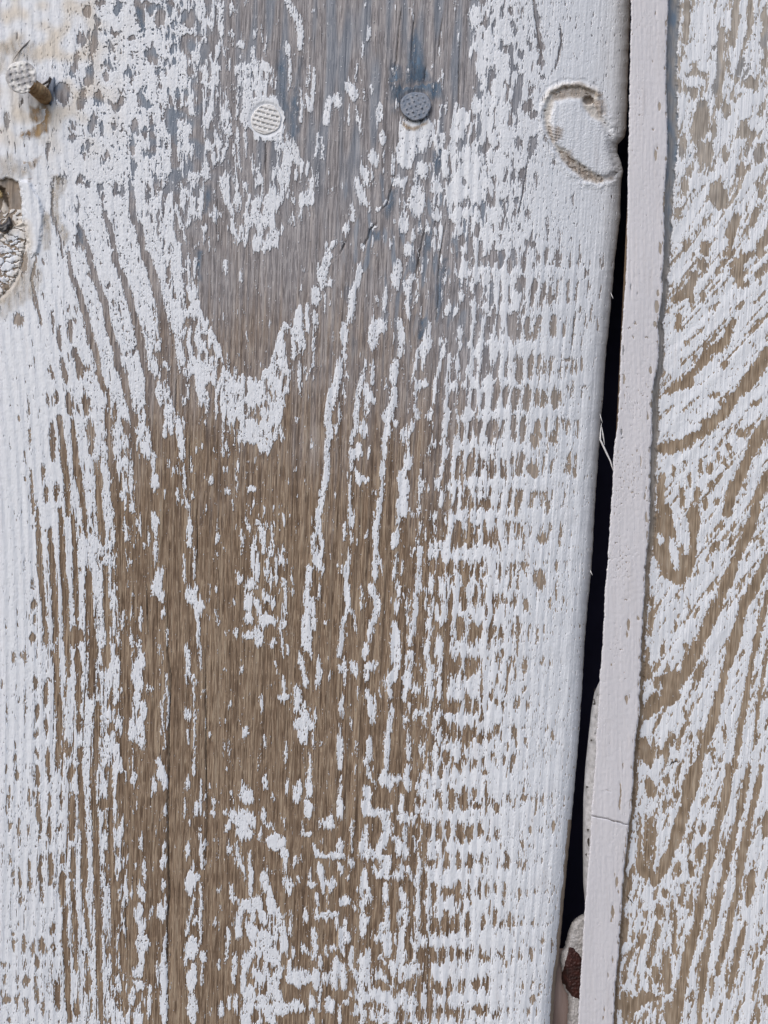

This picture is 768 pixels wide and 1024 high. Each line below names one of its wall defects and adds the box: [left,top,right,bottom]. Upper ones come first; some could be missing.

peeling [0,0,607,1024]
corrosion [561,947,582,999]
peeling [595,0,768,1024]